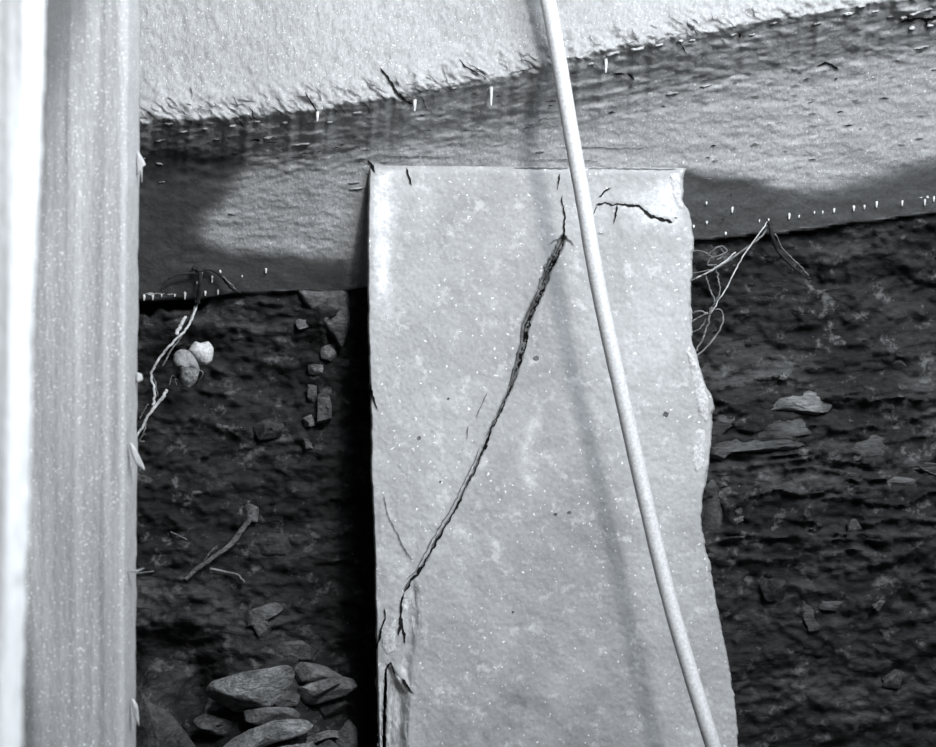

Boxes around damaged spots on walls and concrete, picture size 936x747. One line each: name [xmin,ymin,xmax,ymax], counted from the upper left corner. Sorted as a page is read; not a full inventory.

crack [375,97,677,747]